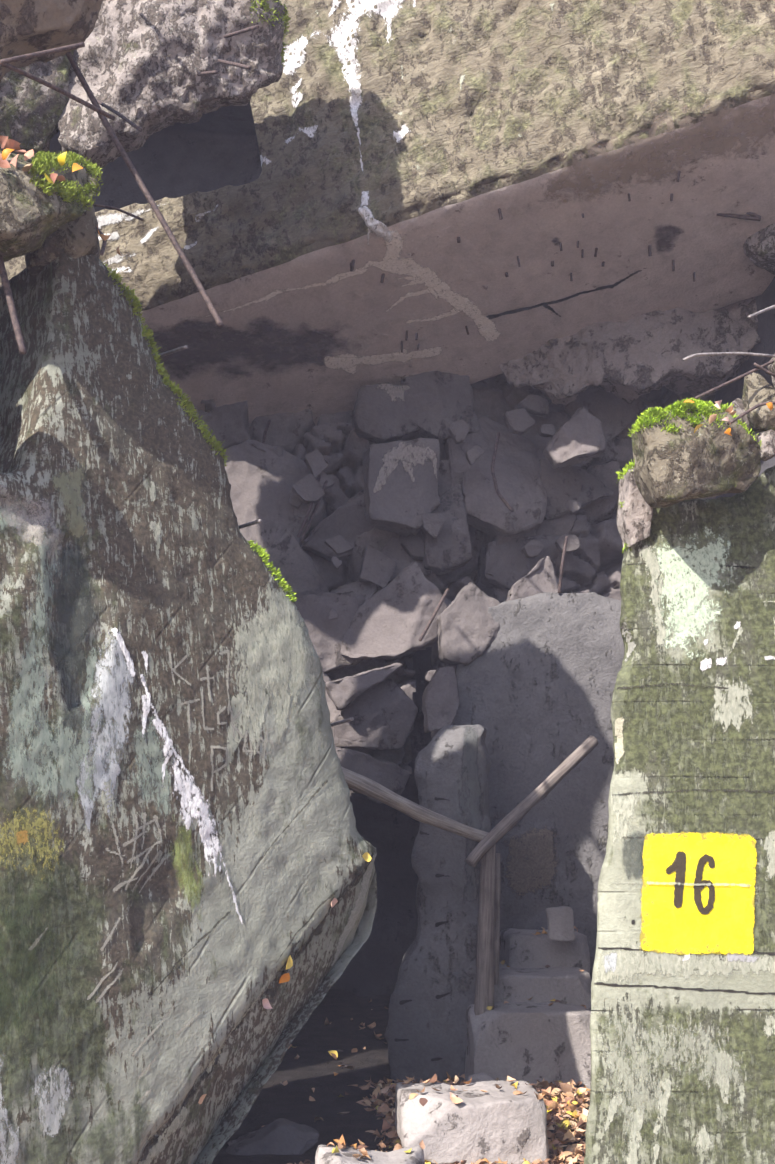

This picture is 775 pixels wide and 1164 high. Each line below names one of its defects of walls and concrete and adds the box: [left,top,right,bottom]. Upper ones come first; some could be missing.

leakage [283,0,416,170]
crack [182,230,646,374]